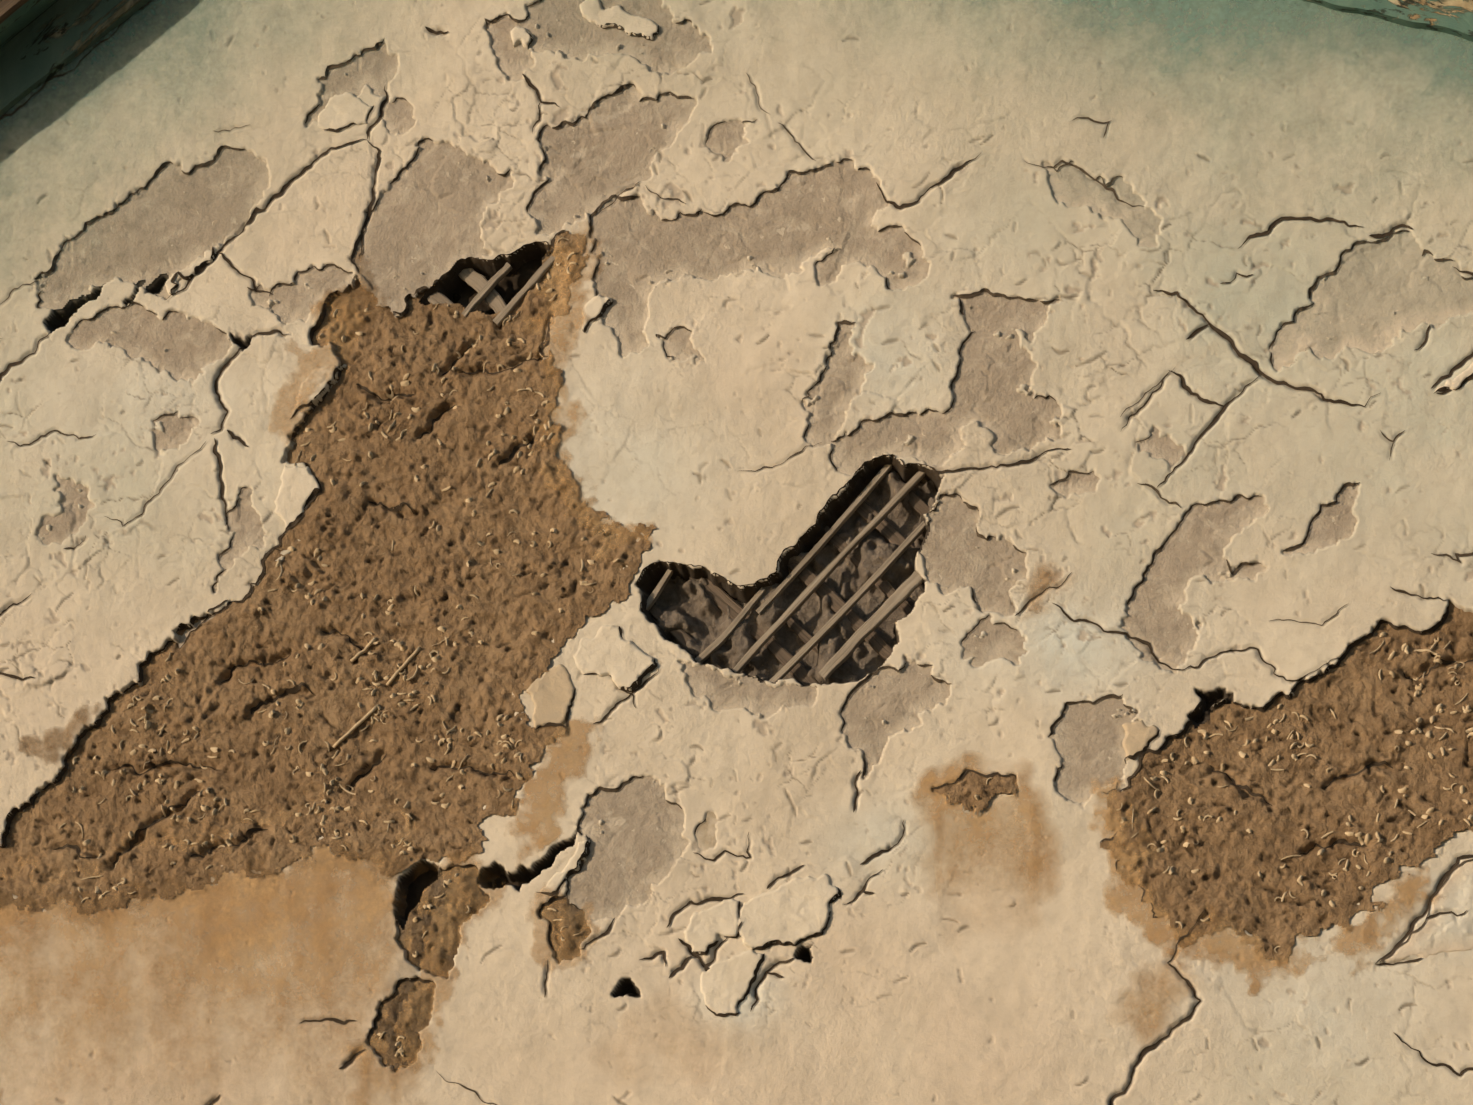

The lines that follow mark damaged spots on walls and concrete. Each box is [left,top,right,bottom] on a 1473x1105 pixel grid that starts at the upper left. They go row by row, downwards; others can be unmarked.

flaking render [35,145,269,381]
crack [64,87,388,549]
flaking render [247,39,514,324]
flaking render [484,0,930,367]
flaking render [802,288,1062,476]
crack [1120,290,1405,508]
flaking render [212,465,319,593]
crack [1015,572,1347,681]
damp [917,755,1051,881]
damp [0,843,401,1030]
crack [640,820,905,1017]
crack [1109,912,1203,1105]